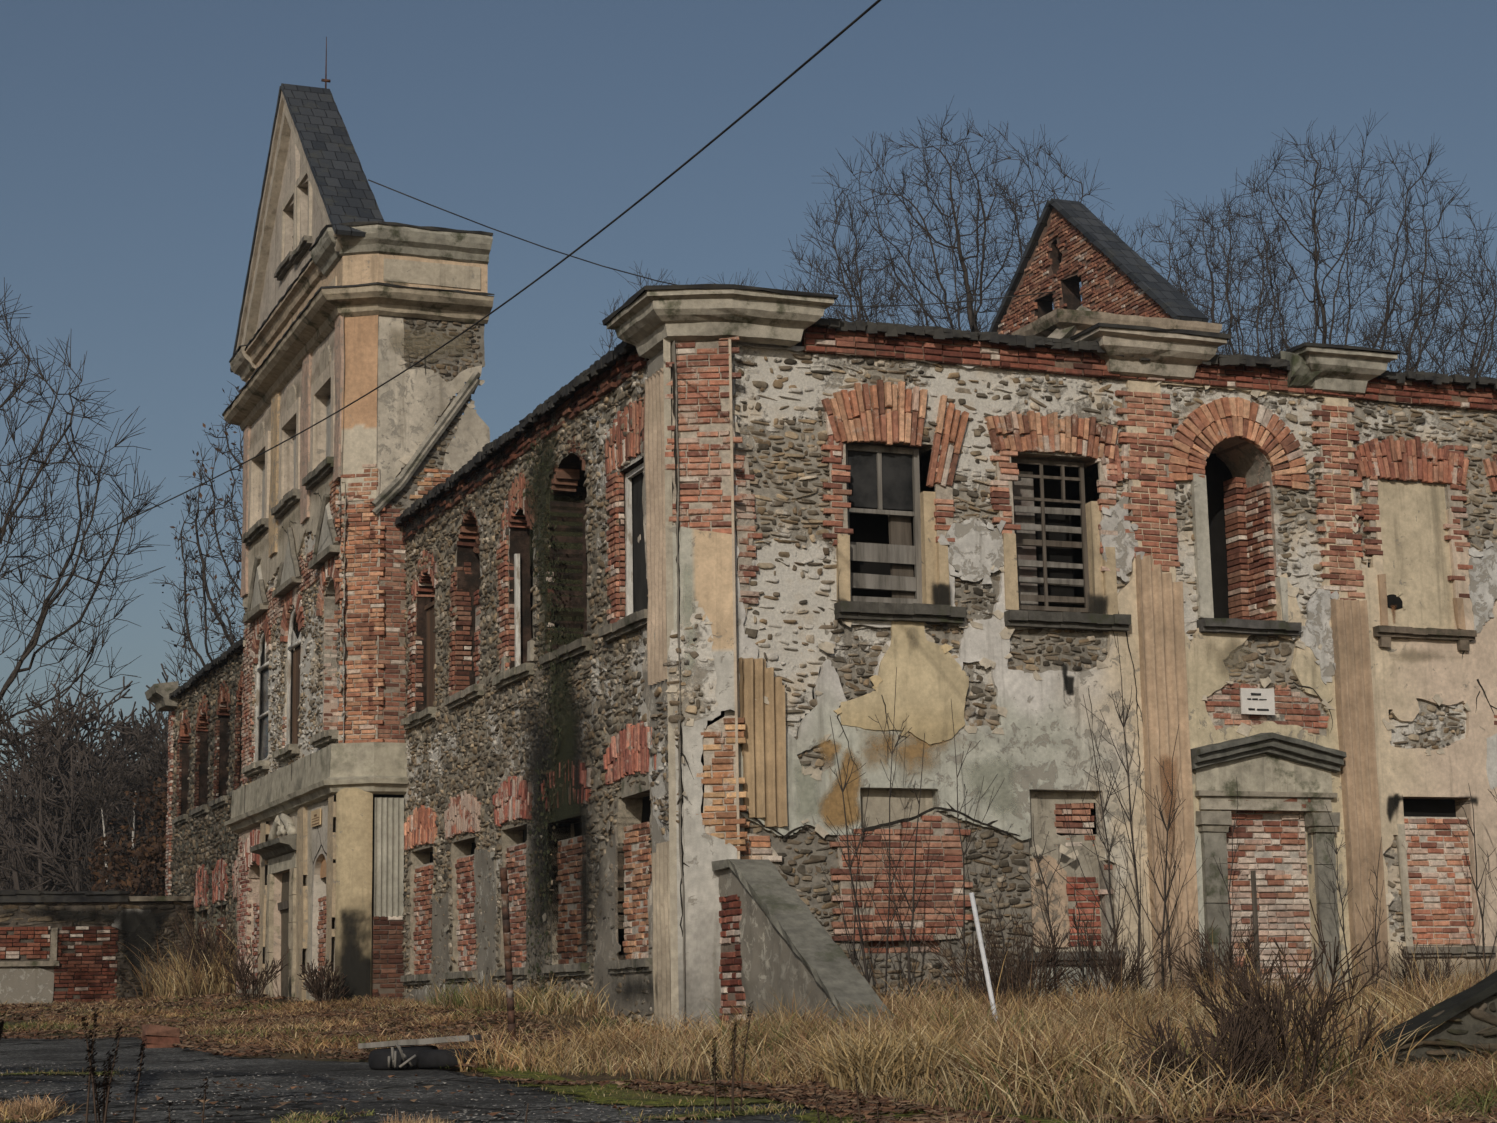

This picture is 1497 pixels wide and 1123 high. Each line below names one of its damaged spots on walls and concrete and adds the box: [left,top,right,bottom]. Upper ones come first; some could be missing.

flaking render [239,317,485,787]
peeling [638,441,647,578]
spalling [665,336,1497,790]
peeling [593,820,654,1017]
spalling [641,601,1079,1028]
flaking render [1098,857,1124,952]
spalling [1382,835,1414,942]